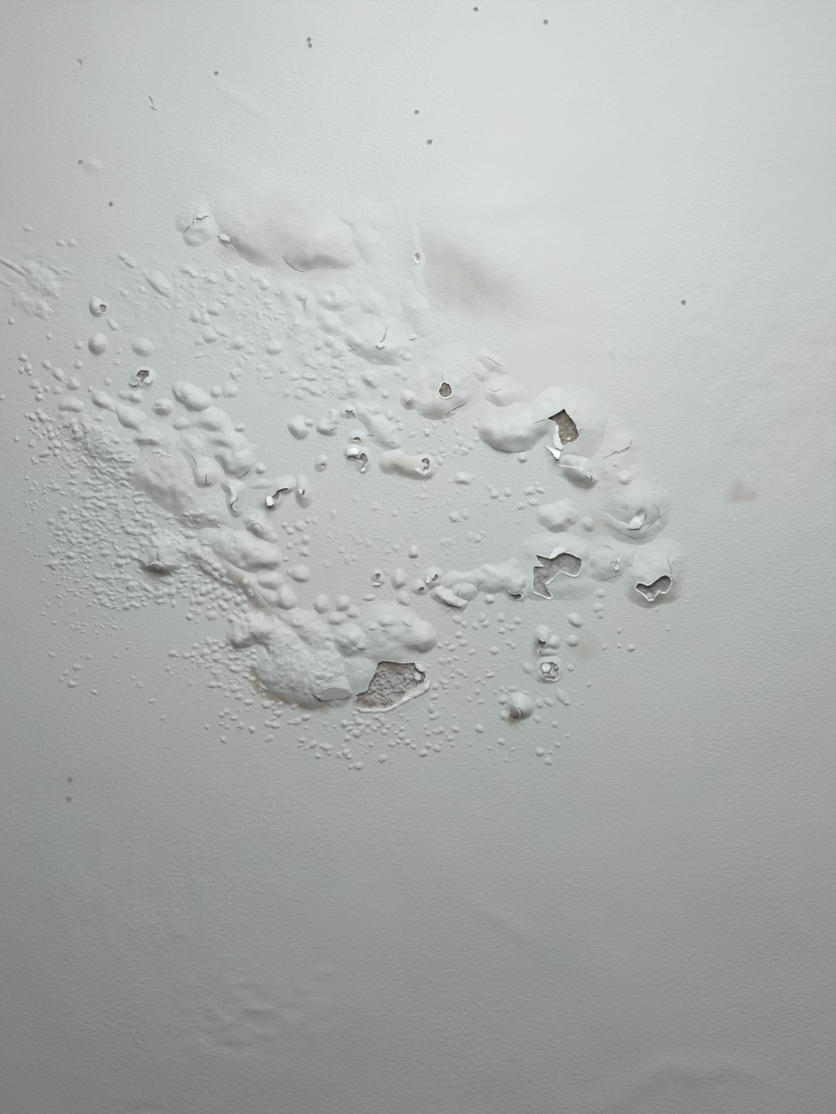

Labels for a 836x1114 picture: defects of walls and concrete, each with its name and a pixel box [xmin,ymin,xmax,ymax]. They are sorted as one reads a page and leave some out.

peeling [474,384,610,459]
peeling [520,532,598,601]
peeling [621,538,688,609]
peeling [332,600,439,717]